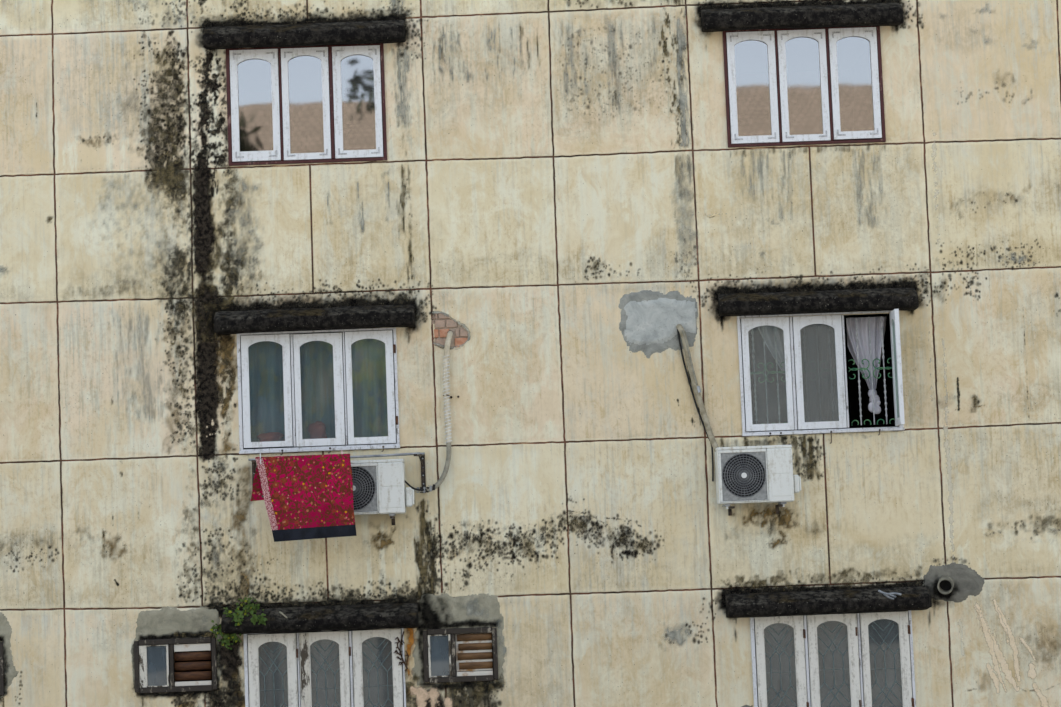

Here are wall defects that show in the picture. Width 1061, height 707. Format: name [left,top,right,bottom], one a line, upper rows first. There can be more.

water stain [134,0,280,608]
flaking render [432,311,470,349]
water stain [414,494,661,599]
water stain [171,636,245,707]